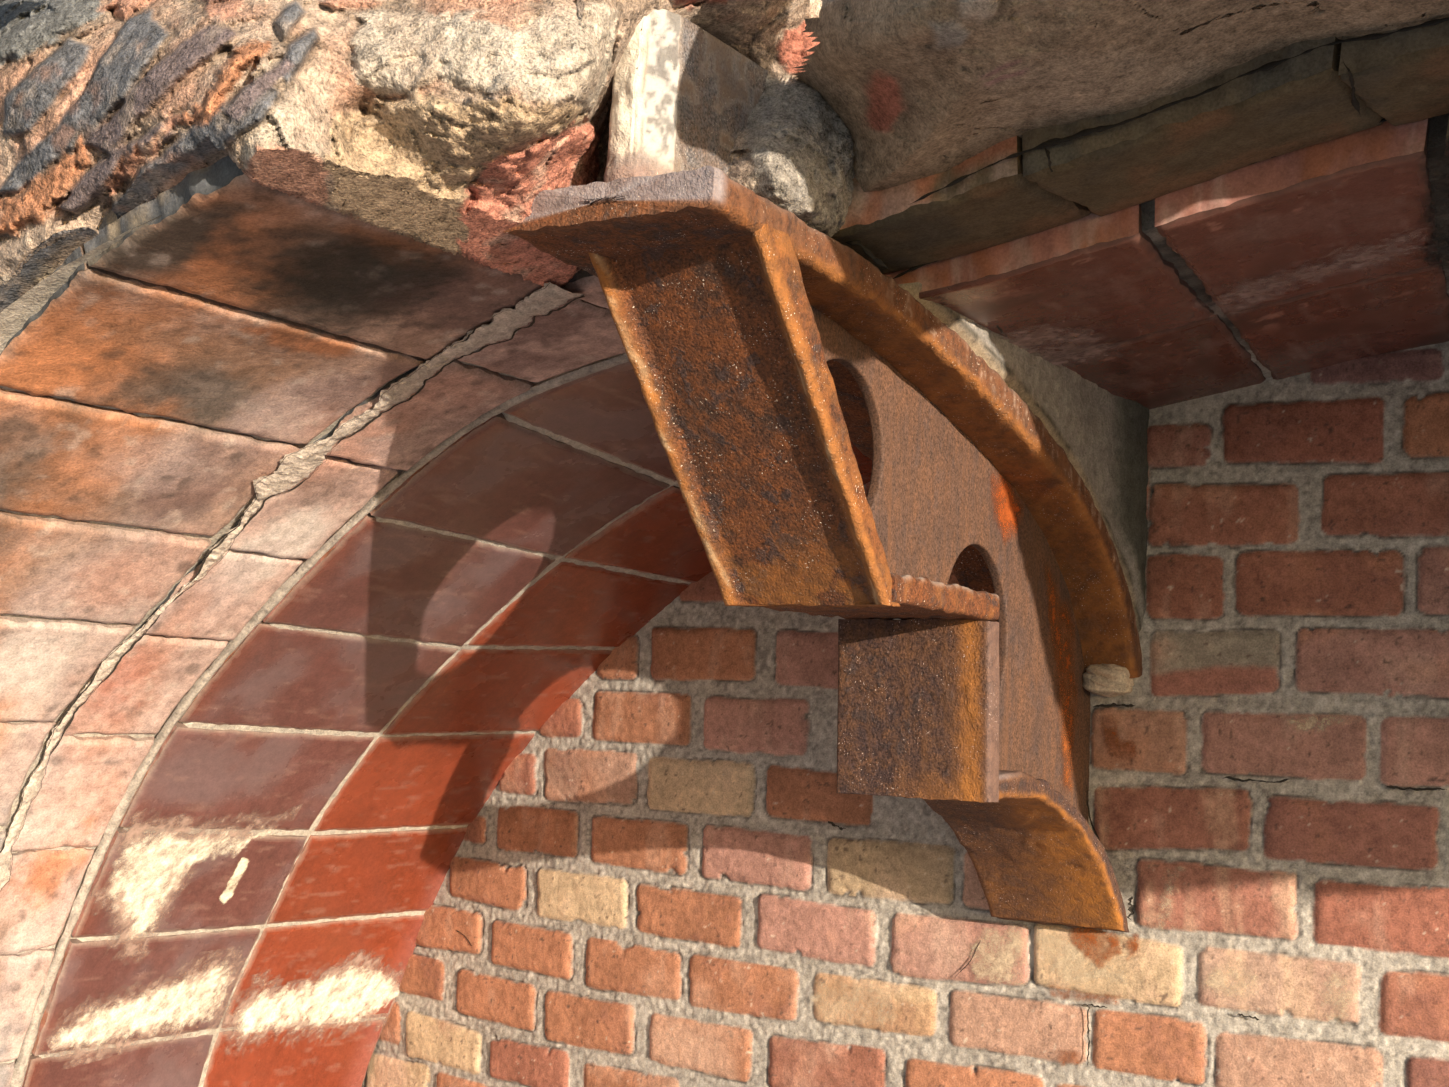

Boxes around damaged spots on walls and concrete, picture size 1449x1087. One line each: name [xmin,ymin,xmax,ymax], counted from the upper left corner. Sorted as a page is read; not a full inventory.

spalling [0,0,855,313]
crack [0,282,585,891]
corrosion [996,481,1022,534]
corrosion [1047,571,1077,786]
damp [95,807,299,956]
damp [47,948,402,1063]